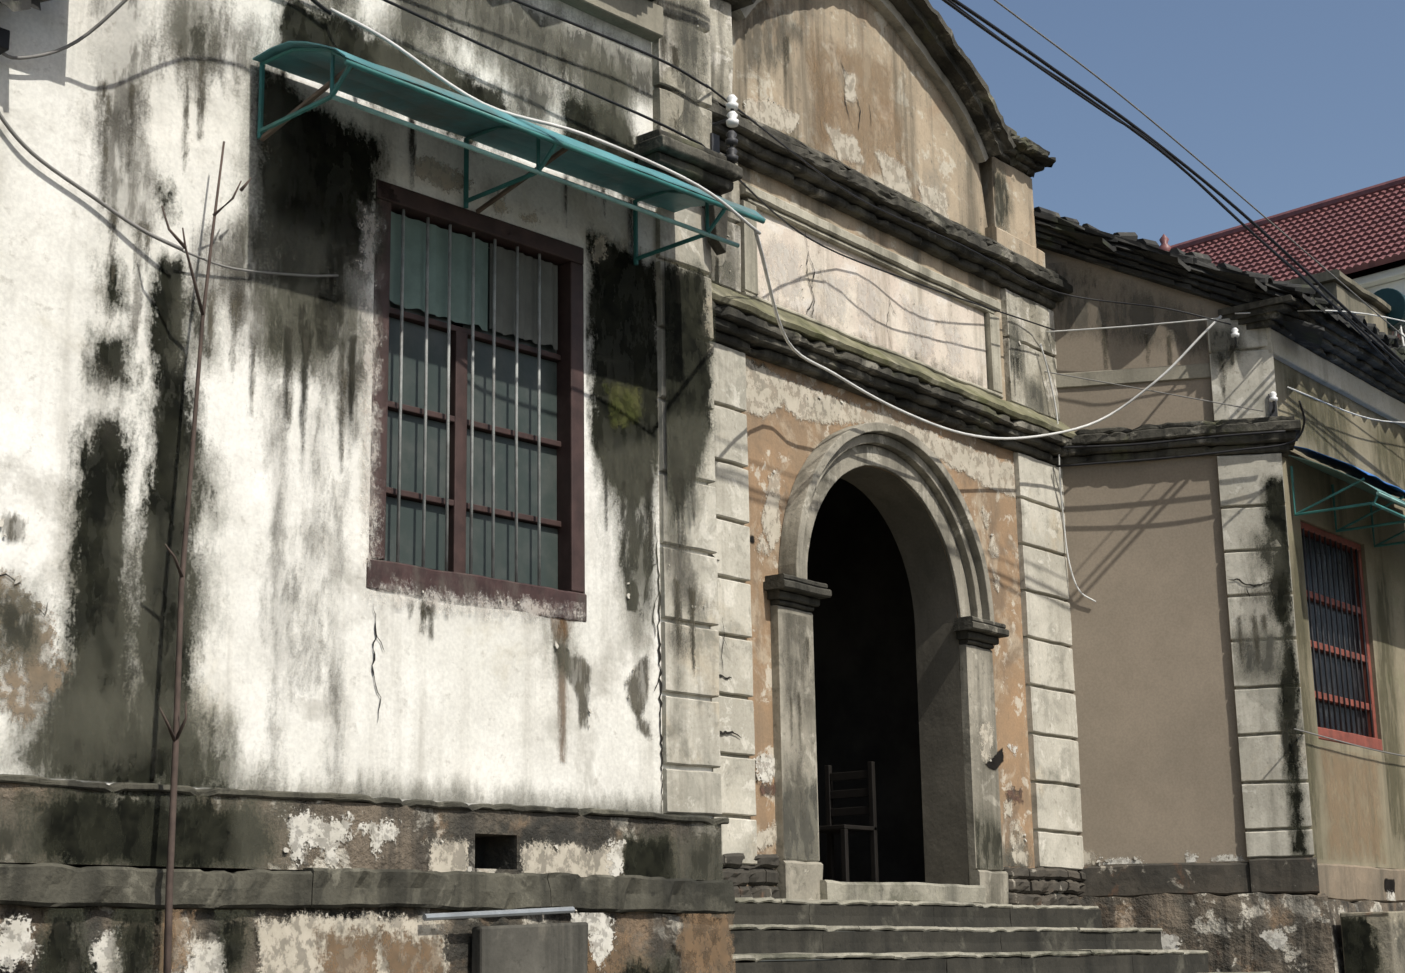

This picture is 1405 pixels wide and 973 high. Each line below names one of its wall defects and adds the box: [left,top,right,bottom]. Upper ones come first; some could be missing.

damp [170,0,258,157]
damp [278,0,638,164]
damp [0,44,388,868]
damp [586,195,714,631]
flaking render [746,359,1015,498]
crack [372,605,385,722]
damp [1236,476,1307,856]
flaking render [278,807,402,869]
flaking render [425,838,472,872]
flaking render [520,838,627,877]
damp [622,832,723,880]
flaking render [255,911,450,973]